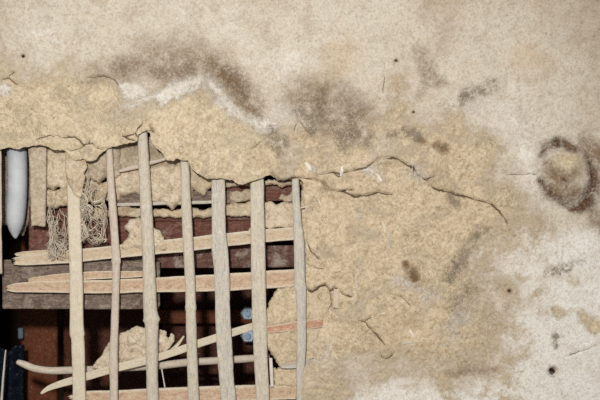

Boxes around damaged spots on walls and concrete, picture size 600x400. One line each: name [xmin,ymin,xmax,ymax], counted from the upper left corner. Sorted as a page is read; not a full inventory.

leakage [387,127,425,143]
crack [273,157,508,224]
flaking render [0,60,545,400]